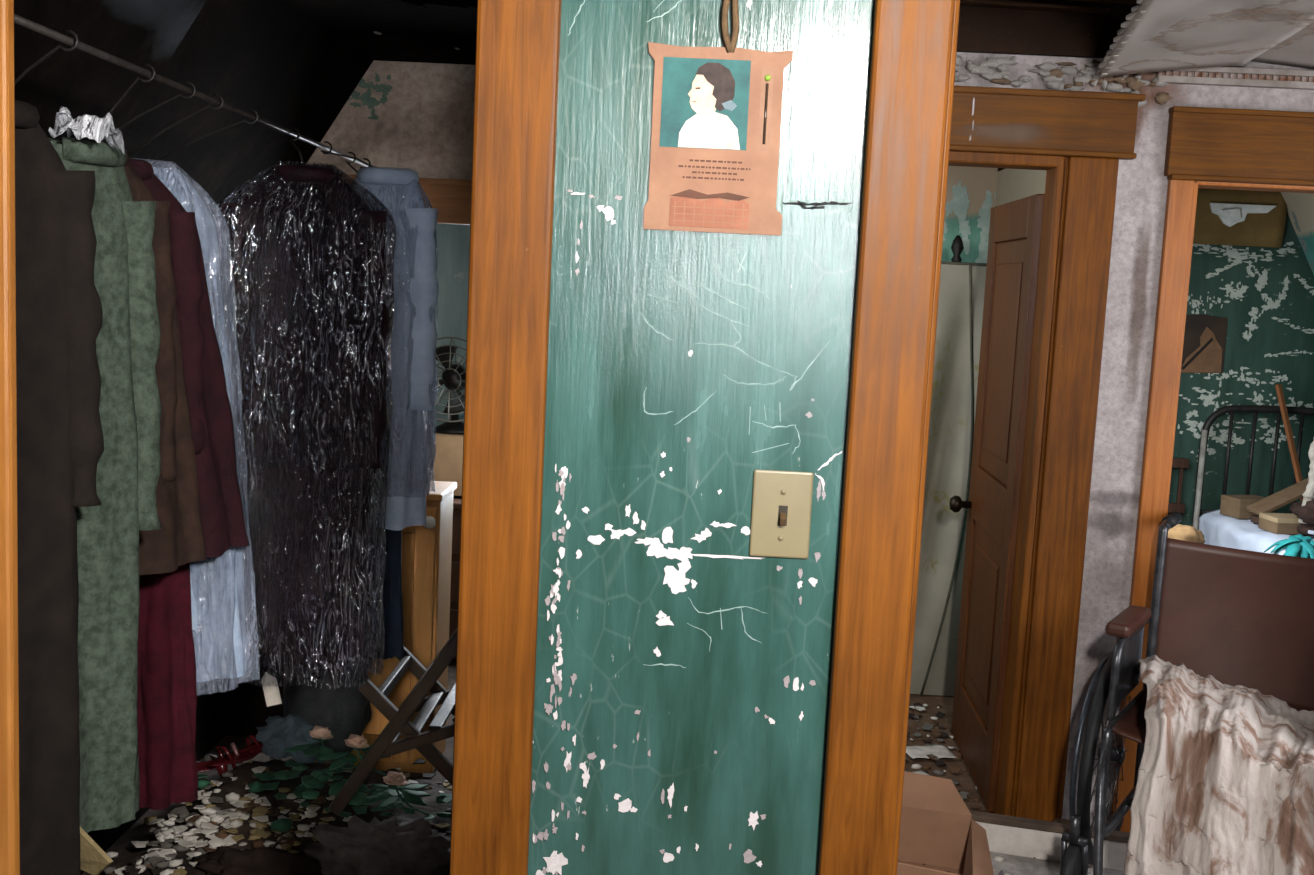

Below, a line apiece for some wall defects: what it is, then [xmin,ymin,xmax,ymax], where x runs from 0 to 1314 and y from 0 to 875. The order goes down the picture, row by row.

flaking render [954,0,1171,107]
crack [783,201,852,209]
peeling [1188,212,1314,341]
peeling [1178,349,1314,462]
peeling [777,552,821,605]
peeling [532,464,762,875]
peeling [783,675,816,691]
peeling [748,811,766,830]